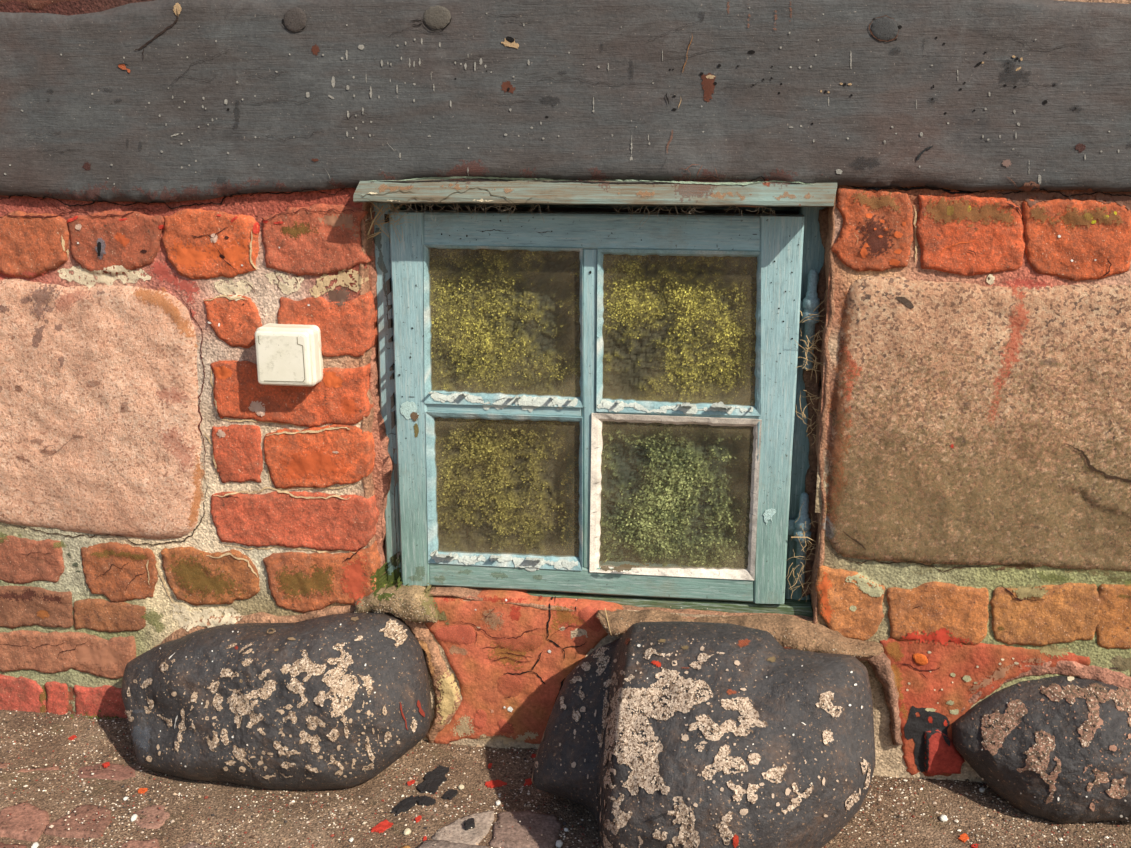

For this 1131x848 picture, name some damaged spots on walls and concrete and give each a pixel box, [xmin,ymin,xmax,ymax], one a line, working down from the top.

peeling [57,242,151,290]
peeling [429,391,578,412]
peeling [597,399,753,418]
crack [1066,444,1131,482]
peeling [430,550,578,571]
crack [461,596,585,720]